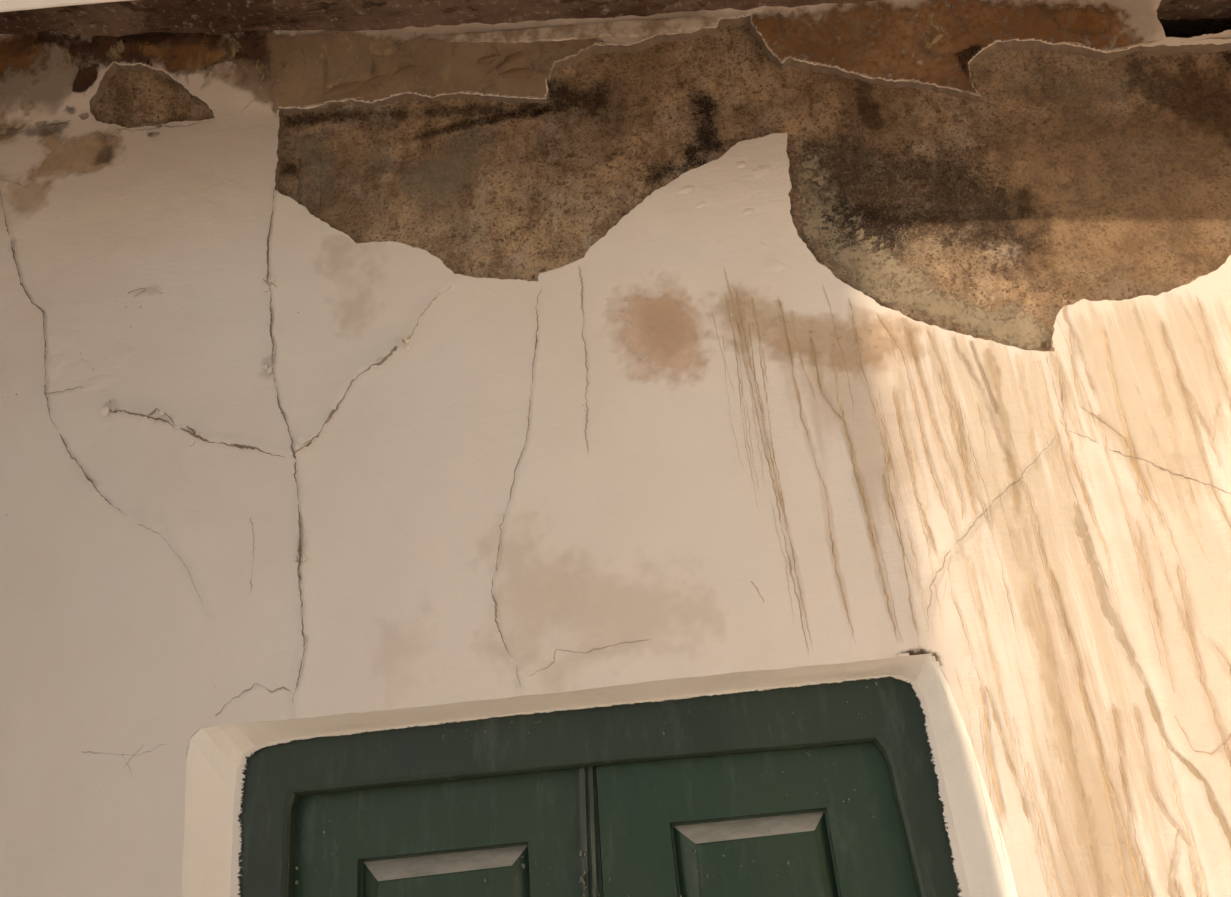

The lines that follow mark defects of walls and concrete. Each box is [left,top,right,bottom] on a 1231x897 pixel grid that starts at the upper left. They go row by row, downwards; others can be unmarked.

spalling [21,62,215,140]
spalling [278,16,1231,352]
crack [0,180,122,513]
crack [100,188,410,716]
crack [491,293,540,677]
water stain [764,441,806,640]
water stain [854,472,874,546]
water stain [881,401,934,632]
water stain [902,354,1016,630]
water stain [973,686,1008,819]
water stain [1026,484,1103,759]
water stain [1139,687,1231,848]